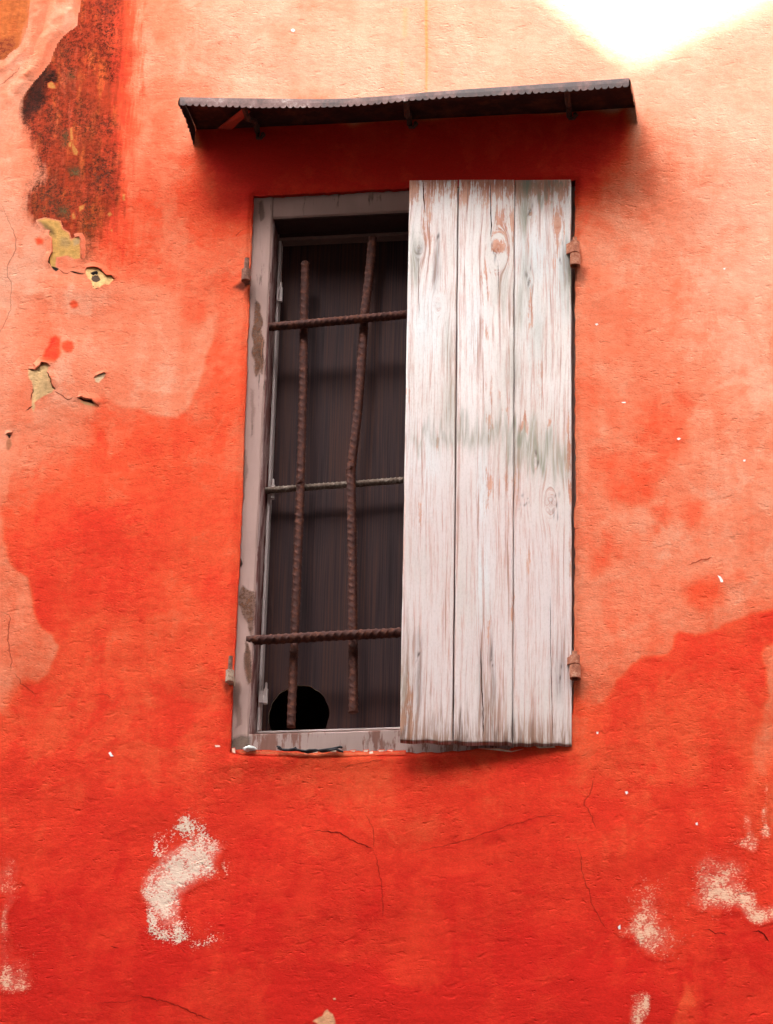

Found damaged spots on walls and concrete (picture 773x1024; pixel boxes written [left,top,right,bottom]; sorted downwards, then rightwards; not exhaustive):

flaking render [36,211,118,289]
flaking render [27,357,109,413]
leakage [368,563,773,947]
crack [314,830,370,848]